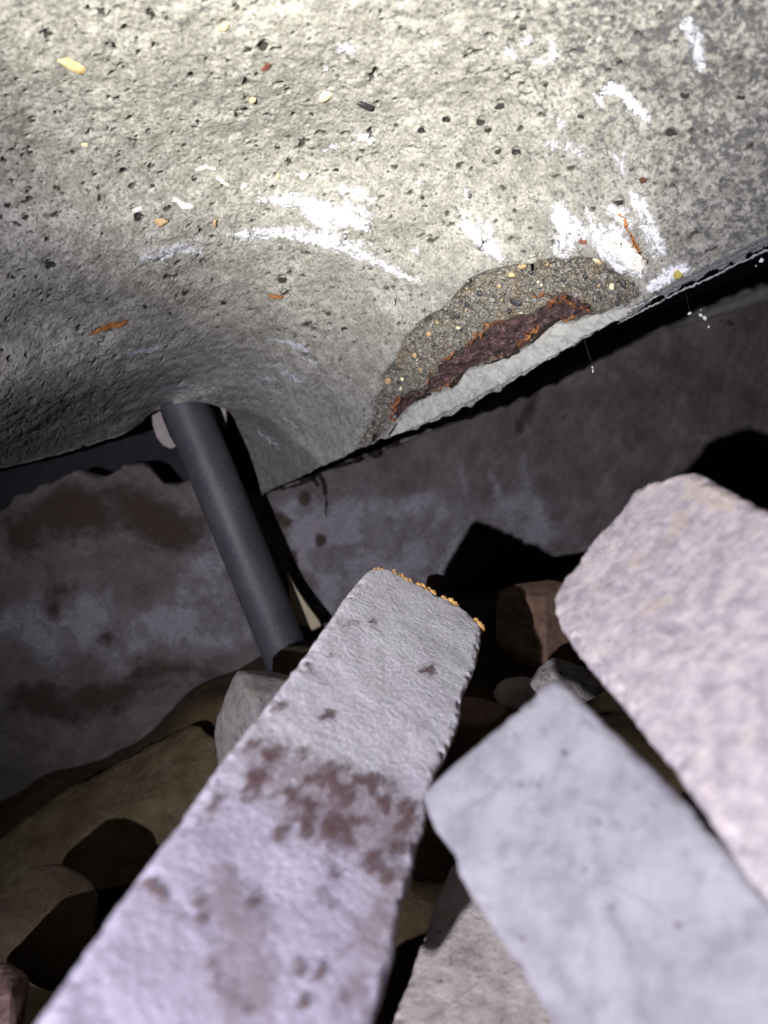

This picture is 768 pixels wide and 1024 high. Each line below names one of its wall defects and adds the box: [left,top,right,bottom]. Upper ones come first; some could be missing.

spalling [352,235,768,447]
efflorescence [549,191,690,293]